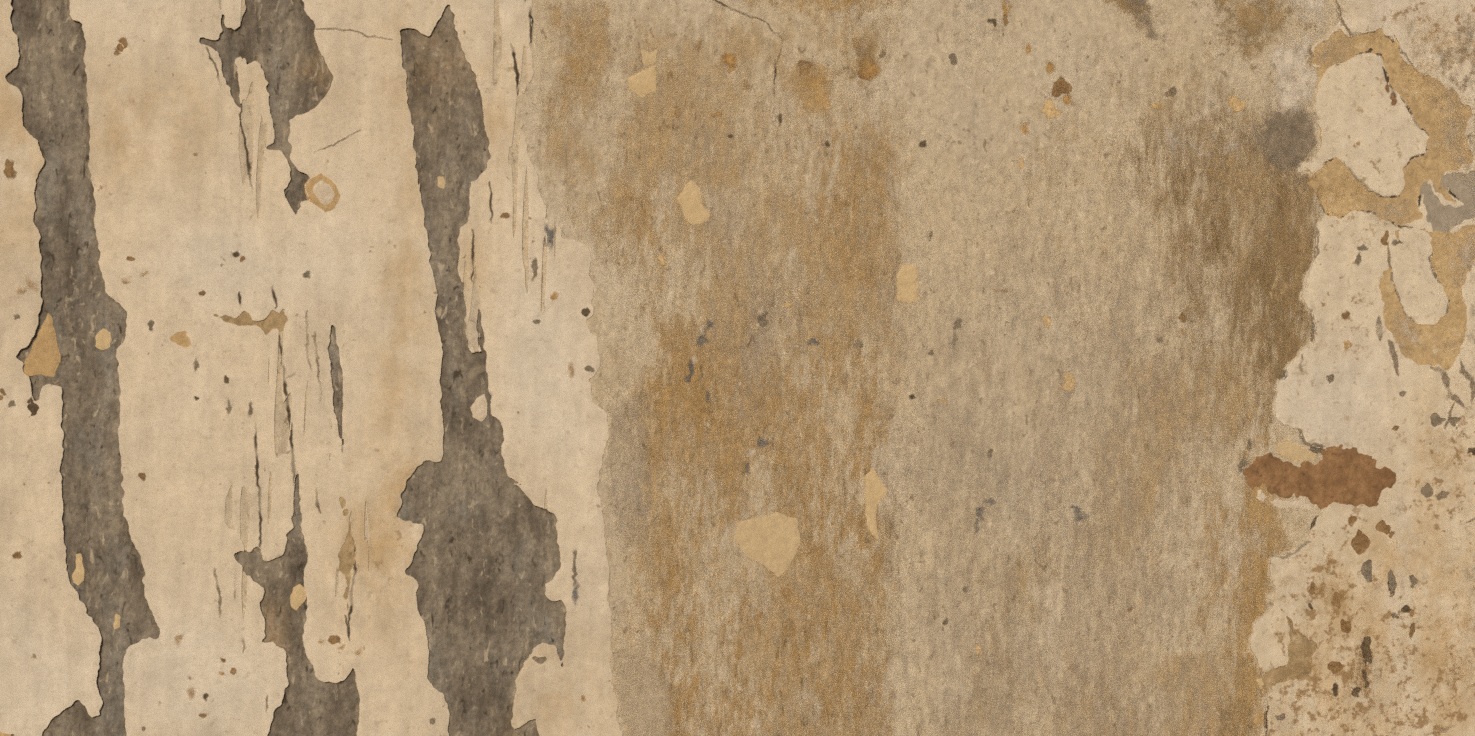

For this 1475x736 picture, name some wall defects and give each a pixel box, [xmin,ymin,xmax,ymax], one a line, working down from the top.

peeling [199,0,340,214]
damp [1108,0,1154,37]
damp [1162,0,1325,383]
peeling [1306,28,1475,370]
peeling [0,0,182,736]
peeling [170,331,199,370]
peeling [397,5,578,736]
peeling [234,474,360,736]
spalling [1243,439,1418,637]